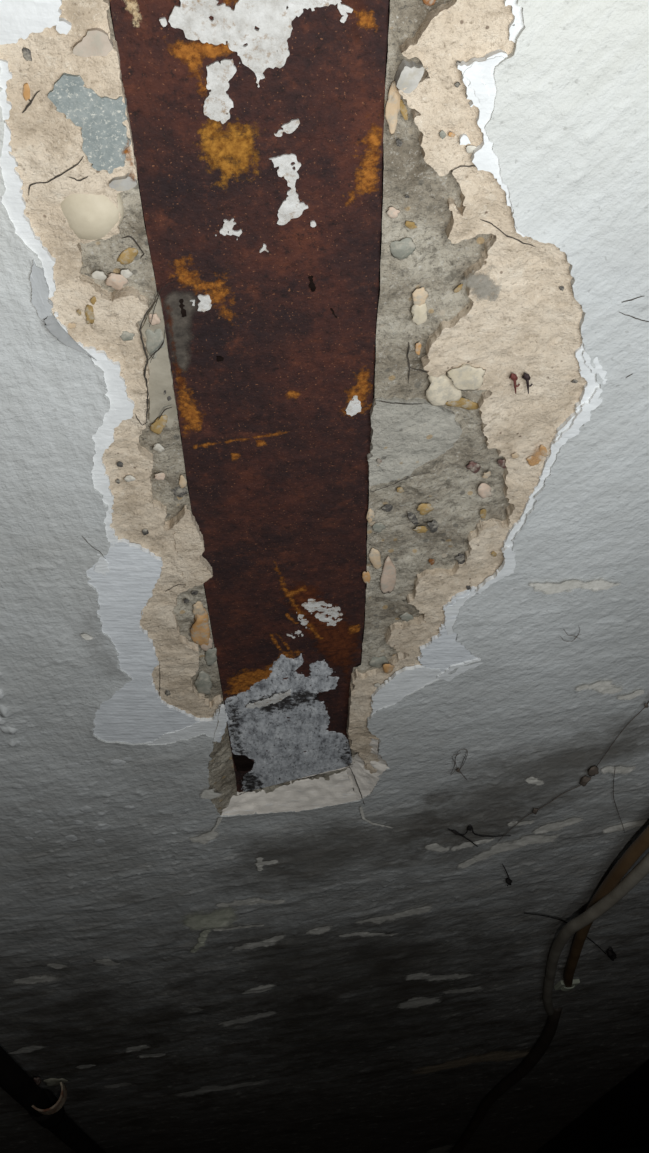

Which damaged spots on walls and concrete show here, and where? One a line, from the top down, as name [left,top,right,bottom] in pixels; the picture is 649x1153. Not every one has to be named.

rust [125,0,142,27]
rust [356,11,377,28]
rust [169,41,233,95]
rust [197,119,258,186]
rust [347,126,382,203]
rust [172,257,232,321]
rust [175,364,202,437]
rust [194,433,282,460]
spalling [0,0,620,844]
rust [344,372,372,416]
rust [275,565,360,672]
rust [224,634,300,694]